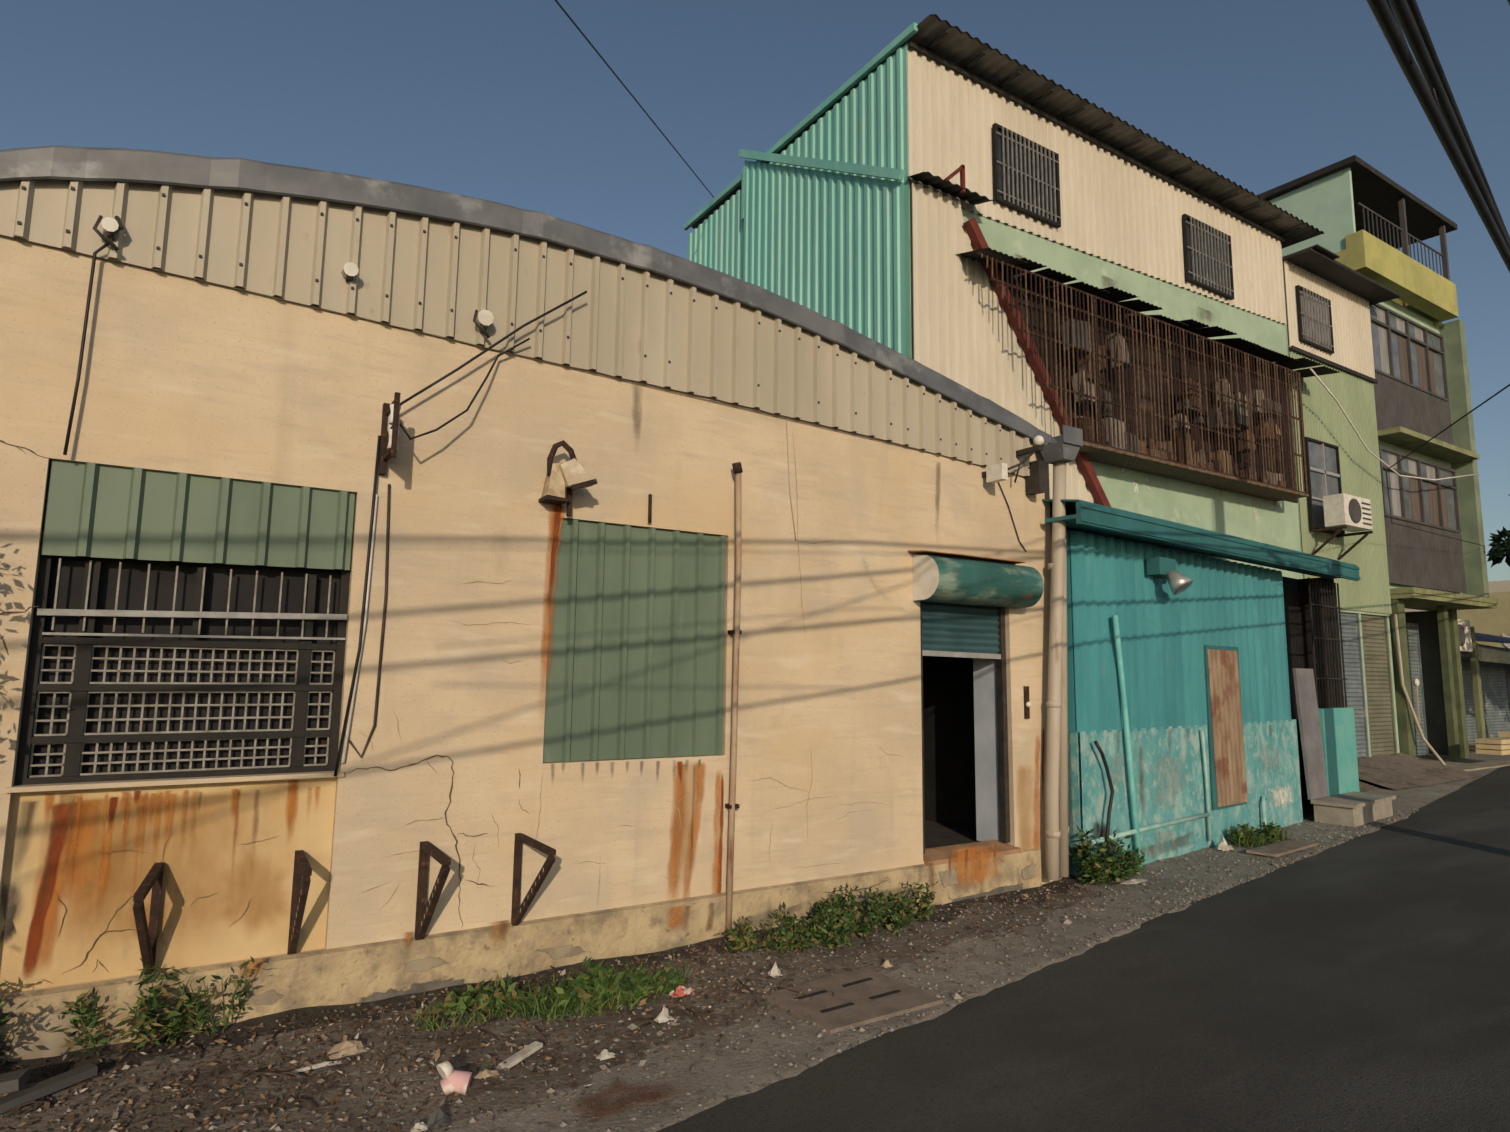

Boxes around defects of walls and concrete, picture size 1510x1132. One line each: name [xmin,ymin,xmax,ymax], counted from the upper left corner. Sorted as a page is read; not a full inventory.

crack [0,440,47,458]
corrosion [24,790,195,973]
corrosion [287,781,297,822]
crack [346,711,543,925]
corrosion [669,762,724,926]